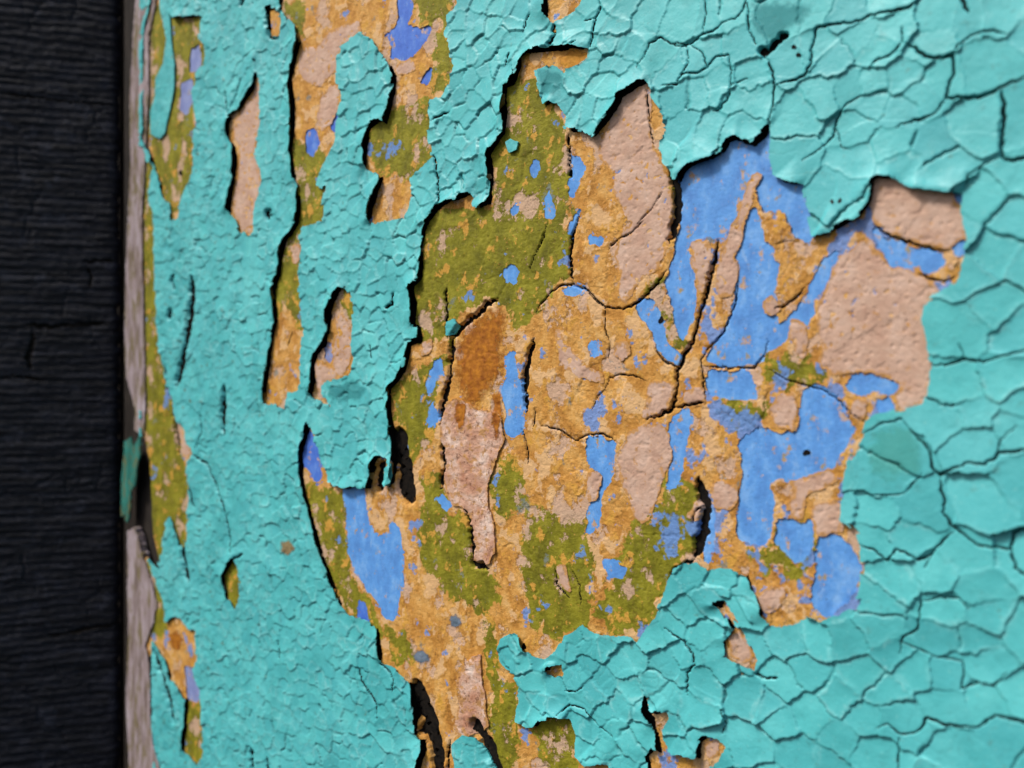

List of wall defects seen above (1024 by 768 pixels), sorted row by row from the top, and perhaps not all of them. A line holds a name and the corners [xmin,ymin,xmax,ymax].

peeling [121,0,205,766]
peeling [229,78,261,236]
peeling [262,0,457,409]
crack [523,174,683,462]
peeling [298,48,967,768]
crack [647,240,865,423]
crack [636,0,1024,187]
crack [874,224,959,283]
peeling [223,561,241,609]
crack [671,477,712,575]
crack [861,426,1024,575]
crack [875,714,1024,768]